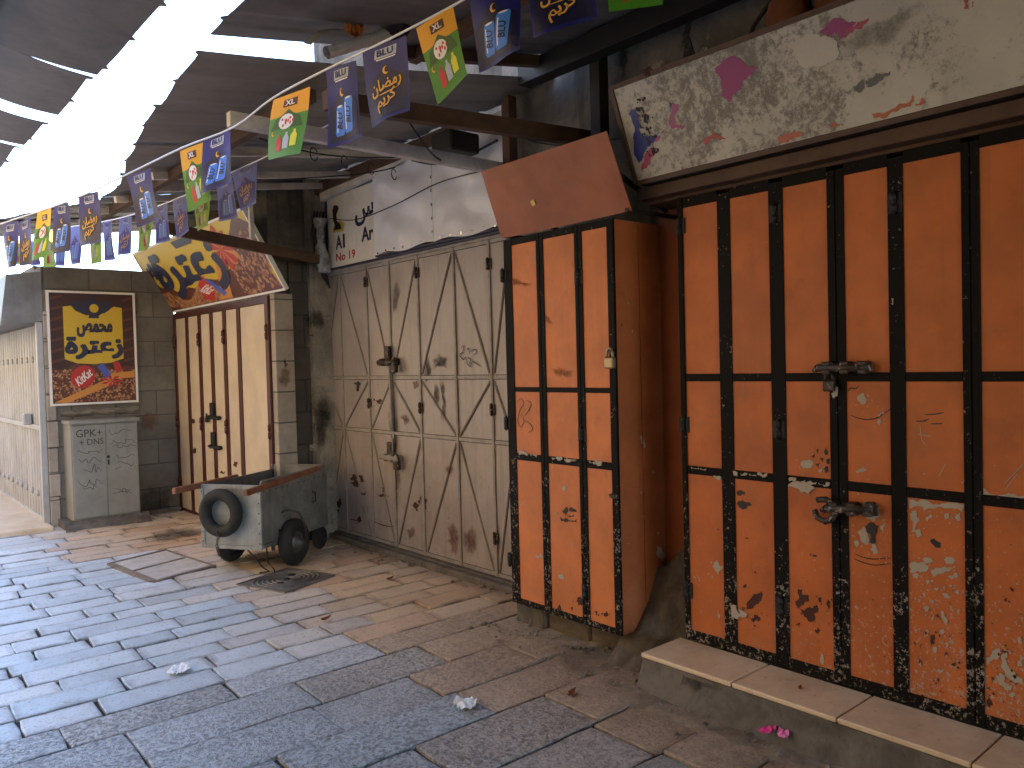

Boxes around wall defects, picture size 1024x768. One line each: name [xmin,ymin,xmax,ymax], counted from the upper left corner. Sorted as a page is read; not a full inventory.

spalling [552,456,603,466]
spalling [691,467,768,480]
spalling [788,447,830,494]
peeling [736,490,752,510]
peeling [849,492,888,560]
peeling [718,584,769,629]
peeling [795,581,832,633]
peeling [909,499,974,682]
peeling [986,621,1023,713]